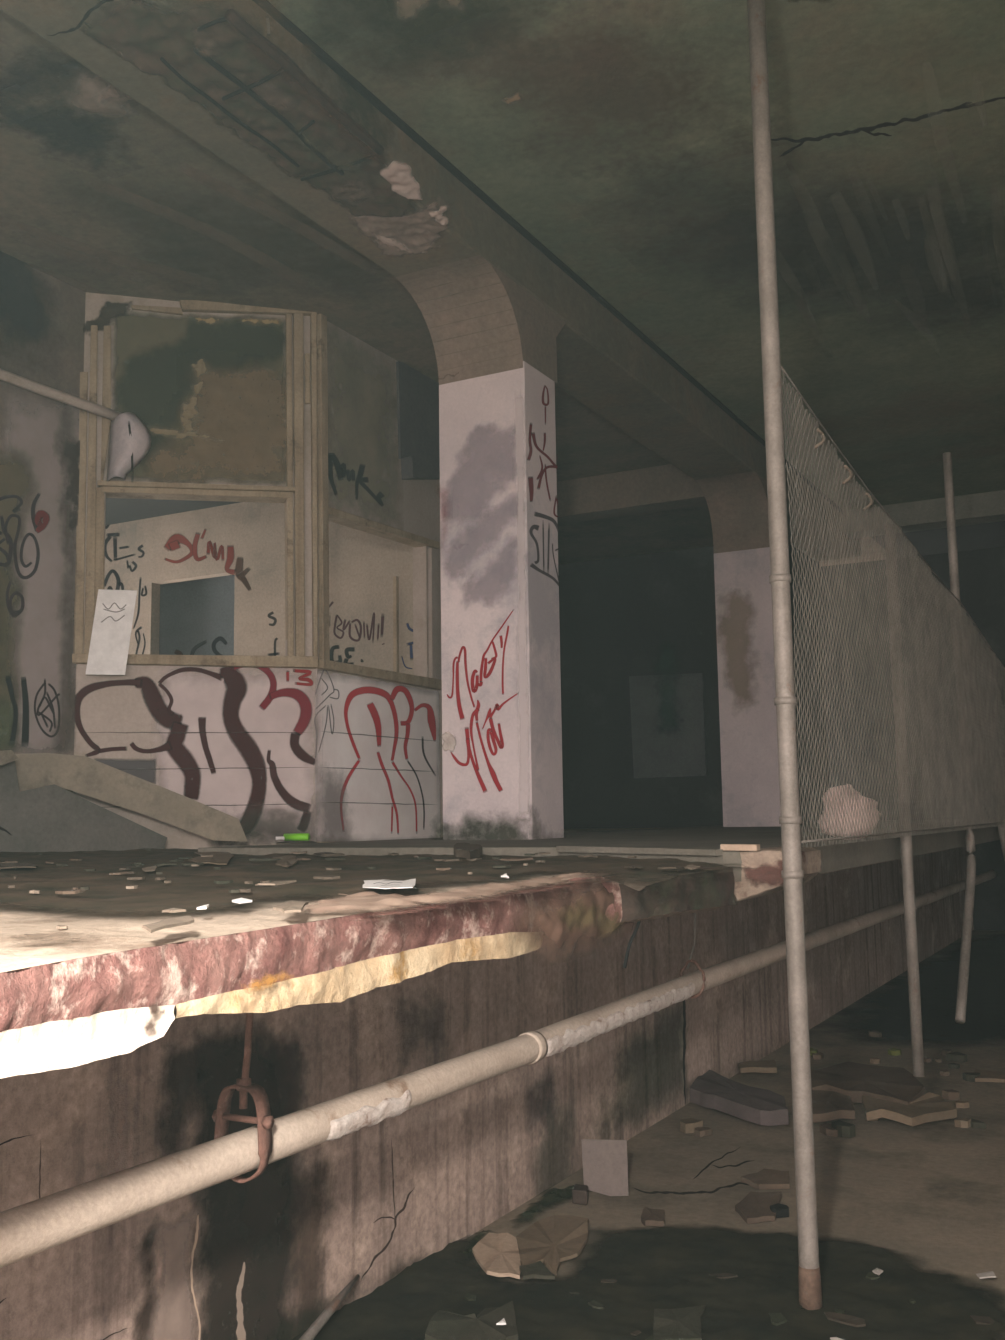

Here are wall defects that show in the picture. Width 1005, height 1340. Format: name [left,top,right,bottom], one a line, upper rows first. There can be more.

crack [48,0,154,36]
peeling [396,0,429,19]
crack [771,97,1005,156]
peeling [350,161,449,256]
water stain [692,199,758,272]
water stain [774,193,1005,314]
spalling [0,932,541,1079]
water stain [155,1031,303,1155]
peeling [326,1089,412,1140]
water stain [135,1226,158,1340]
water stain [195,1155,329,1340]
crack [361,1140,413,1280]